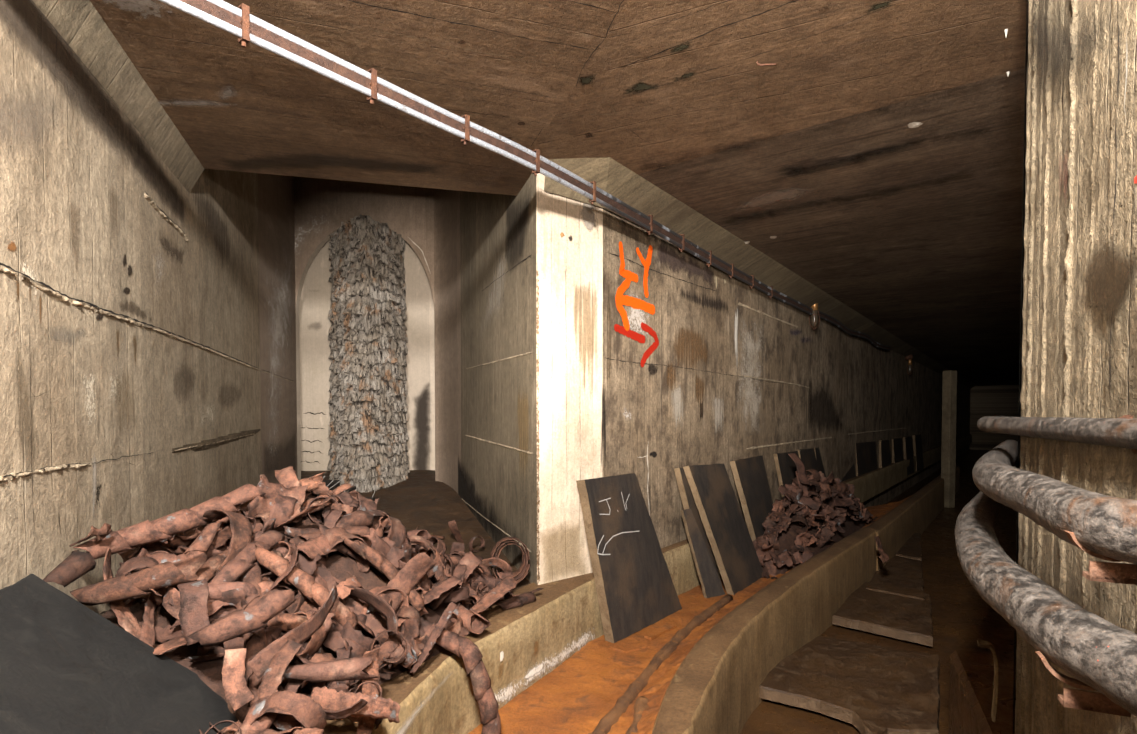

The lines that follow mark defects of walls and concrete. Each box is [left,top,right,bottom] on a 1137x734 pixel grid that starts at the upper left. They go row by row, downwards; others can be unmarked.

crack [349,0,798,146]
water stain [1084,244,1135,317]
crack [94,422,154,465]